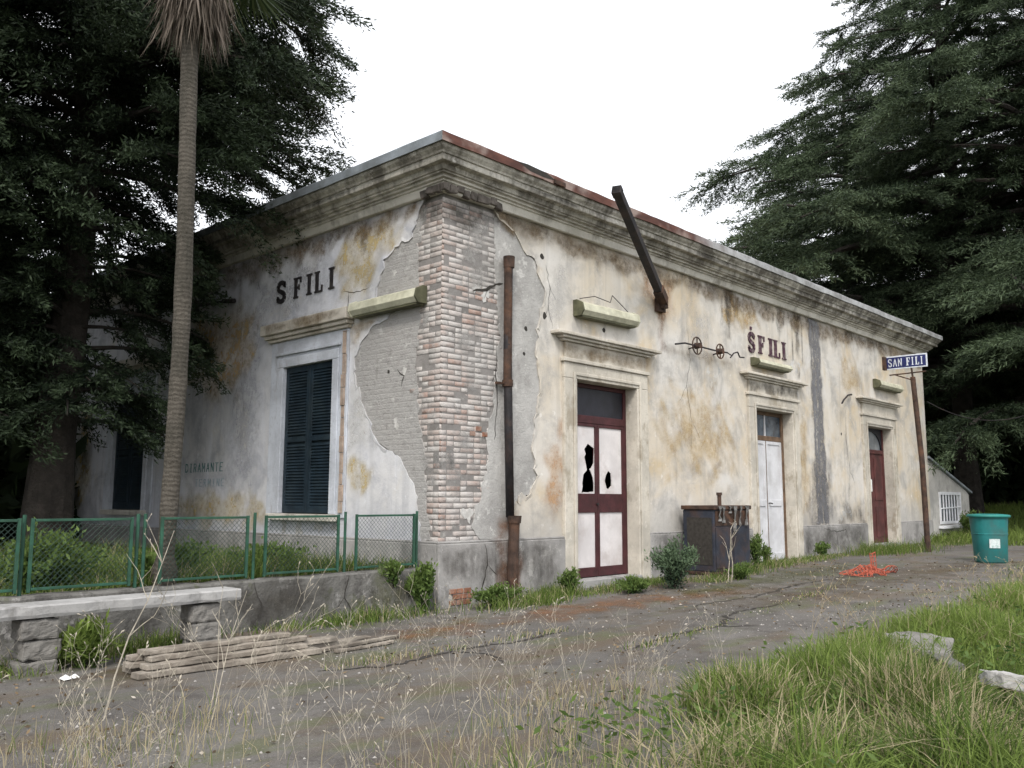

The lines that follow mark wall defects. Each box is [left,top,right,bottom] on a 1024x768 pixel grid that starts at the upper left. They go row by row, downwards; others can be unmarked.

water stain [340,211,391,281]
spalling [282,183,547,542]
water stain [695,282,891,525]